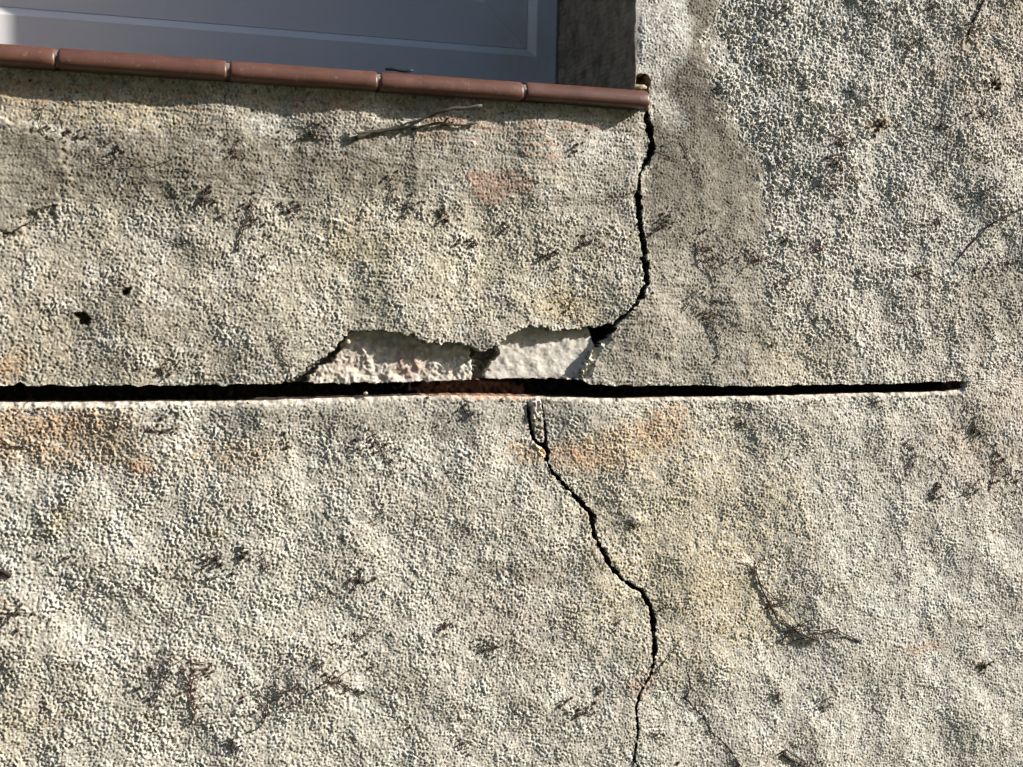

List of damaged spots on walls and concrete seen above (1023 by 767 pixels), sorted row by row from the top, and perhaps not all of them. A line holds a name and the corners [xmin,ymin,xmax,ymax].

crack [94,159,172,168]
crack [1,204,58,235]
crack [587,109,679,348]
spalling [284,325,610,397]
crack [0,439,34,449]
crack [526,401,741,767]